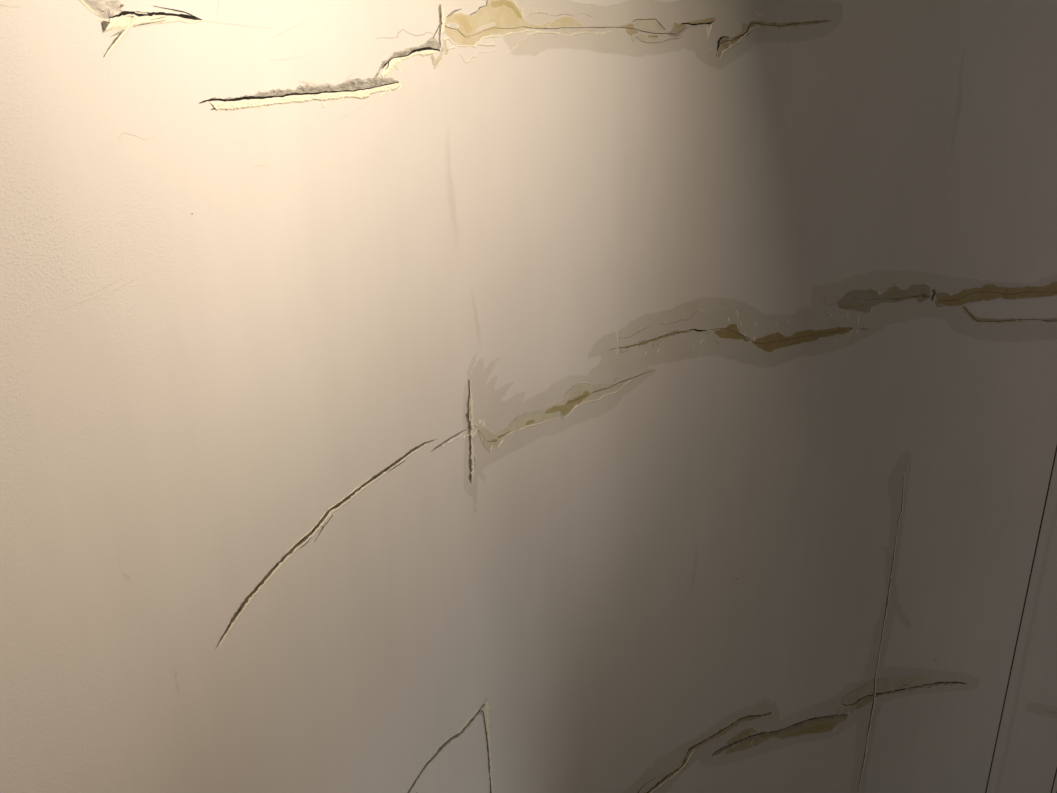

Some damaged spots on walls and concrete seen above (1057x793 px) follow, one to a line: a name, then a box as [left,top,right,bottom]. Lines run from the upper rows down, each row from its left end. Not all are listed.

flaking render [79,0,202,58]
crack [200,4,831,111]
crack [215,439,437,652]
crack [637,463,966,793]
crack [407,698,494,793]